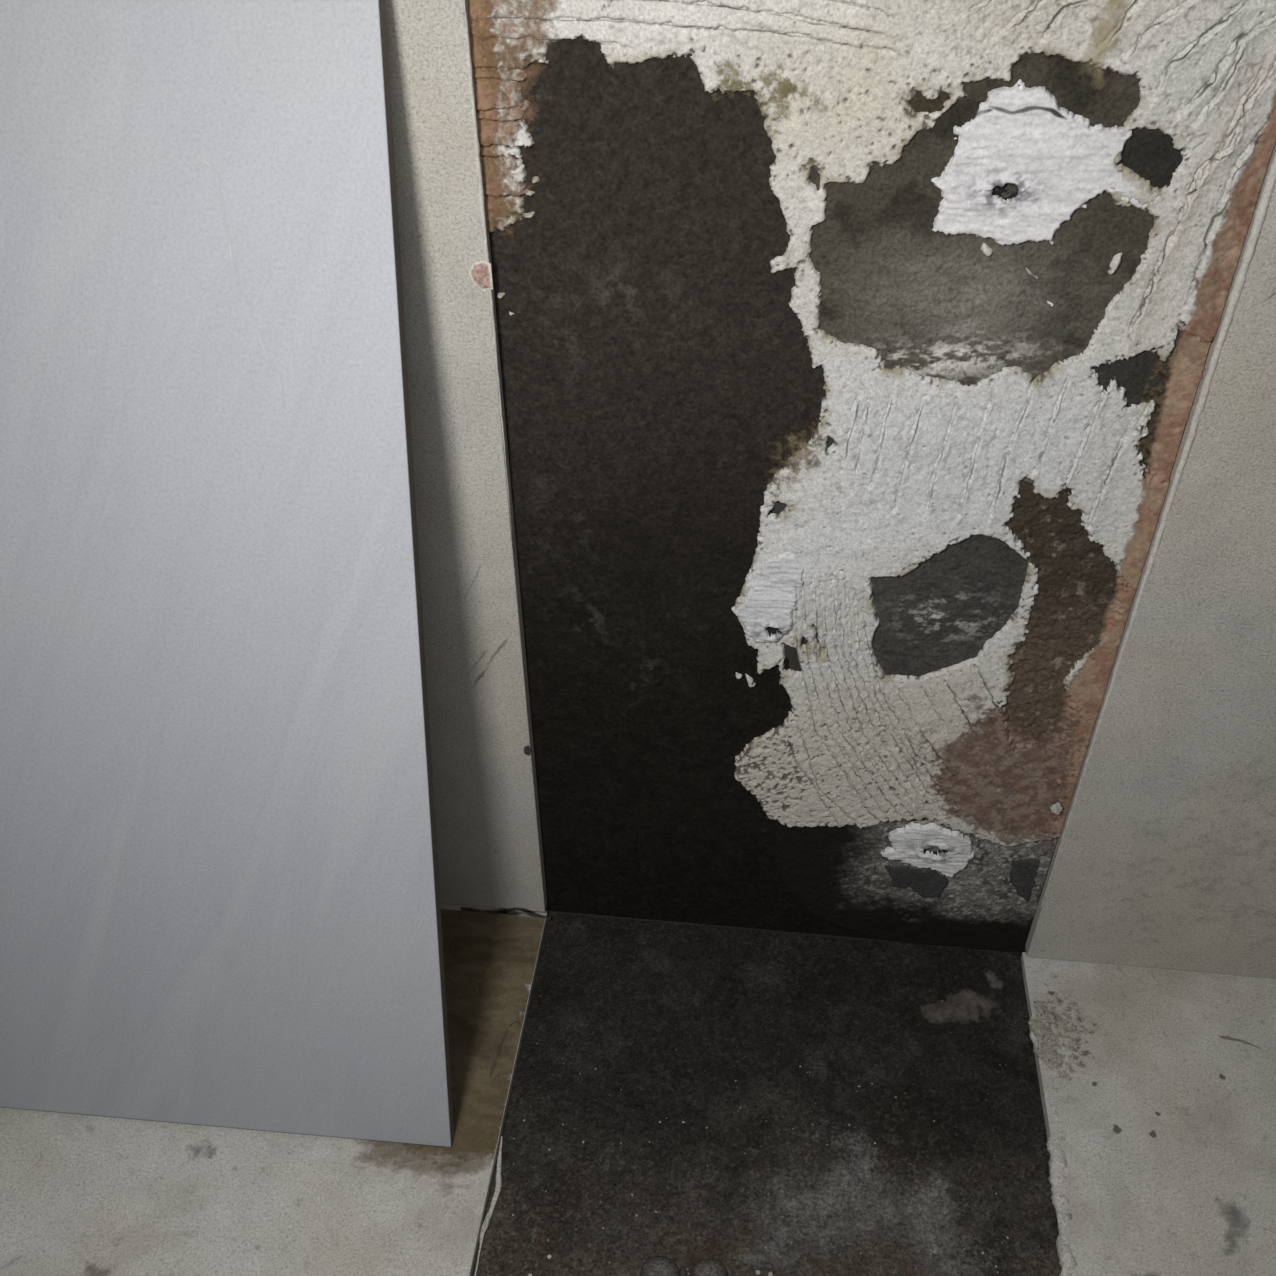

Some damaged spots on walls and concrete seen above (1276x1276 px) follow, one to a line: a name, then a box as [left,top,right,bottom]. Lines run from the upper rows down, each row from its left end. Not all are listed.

peeling [469,261,505,298]
spalling [809,52,1183,408]
spalling [871,477,1118,741]
peeling [735,672,756,687]
spalling [775,820,1058,952]